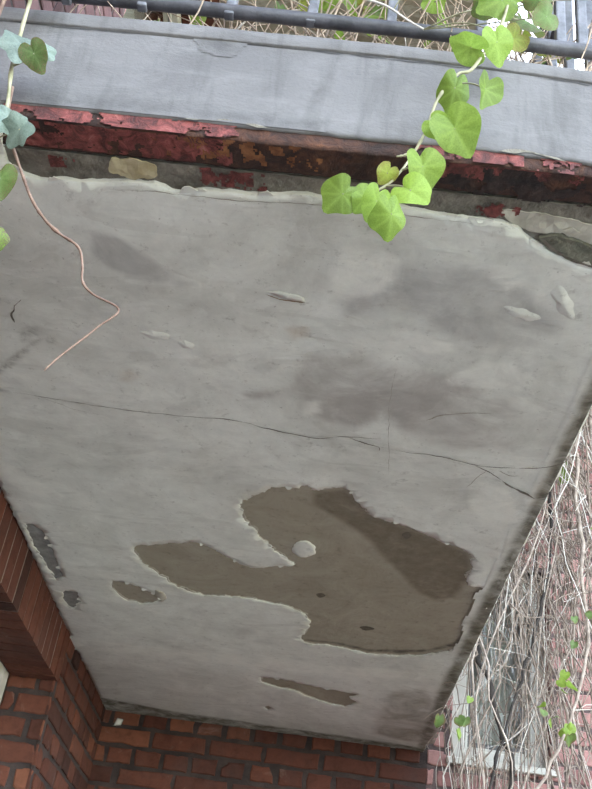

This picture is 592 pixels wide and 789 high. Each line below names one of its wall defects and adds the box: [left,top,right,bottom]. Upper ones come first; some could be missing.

peeling [3,103,328,196]
peeling [416,144,585,186]
spalling [399,190,592,227]
spalling [522,228,592,269]
crack [23,375,569,499]
spalling [24,524,63,578]
peeling [134,485,483,656]
spalling [63,591,82,608]
peeling [111,581,167,604]
peeling [261,677,359,707]